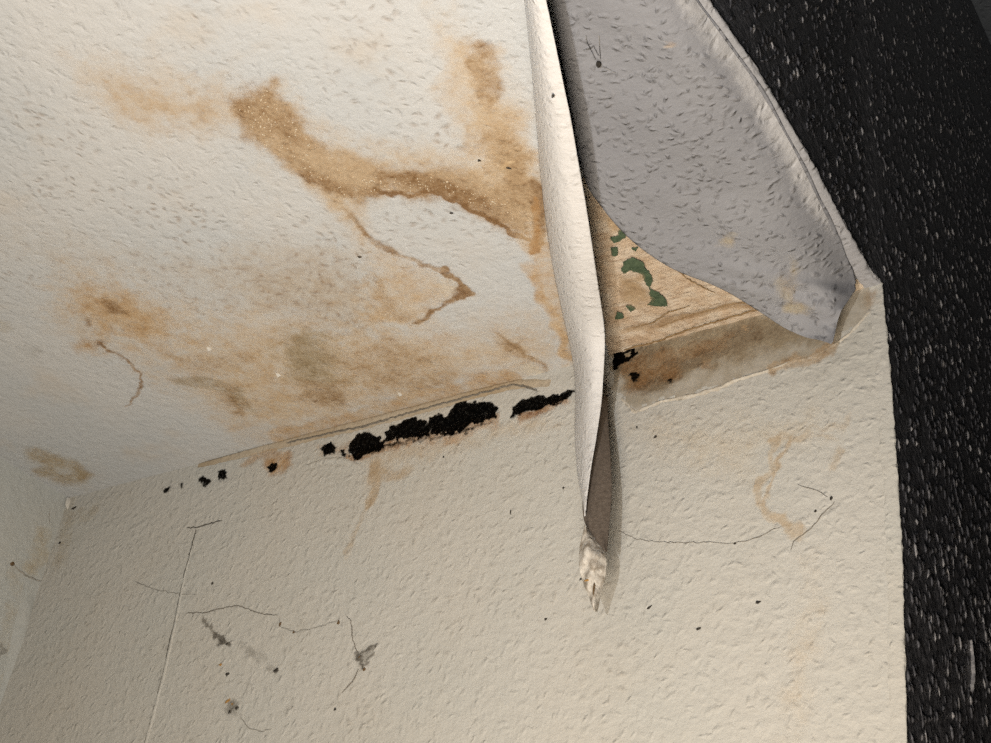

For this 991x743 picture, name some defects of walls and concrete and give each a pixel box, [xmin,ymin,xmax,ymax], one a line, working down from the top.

leakage [101,38,575,511]
flaking render [582,177,763,355]
leakage [59,282,170,406]
leakage [609,287,875,414]
leakage [28,449,93,484]
crack [620,485,834,549]
leakage [654,424,809,540]